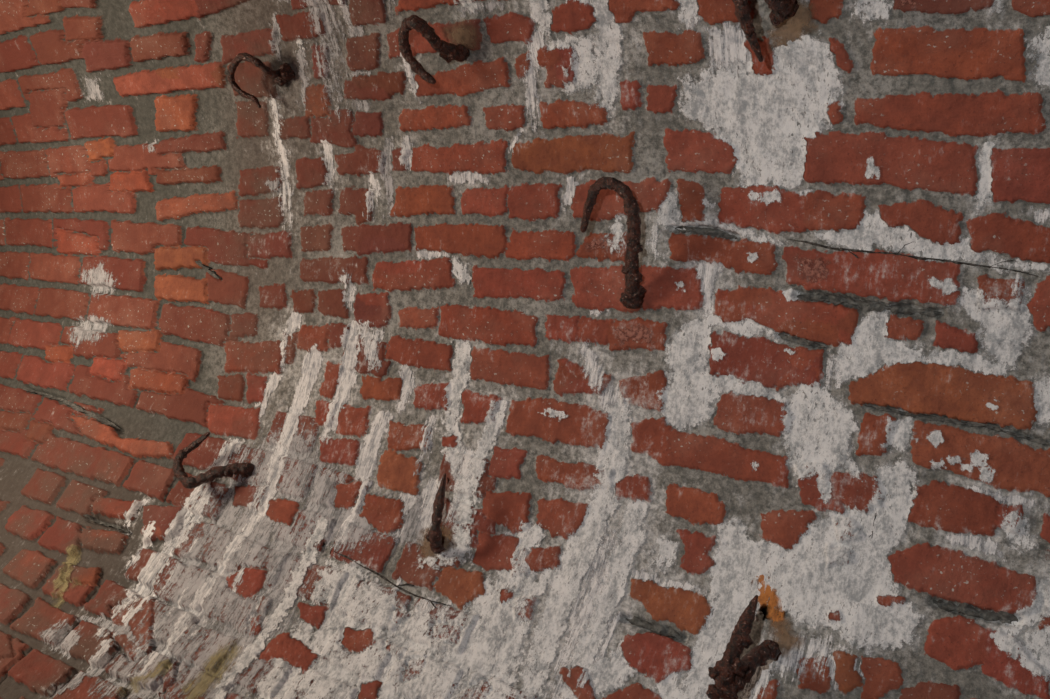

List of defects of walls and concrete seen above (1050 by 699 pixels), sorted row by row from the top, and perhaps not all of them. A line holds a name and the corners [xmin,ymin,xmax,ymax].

rust [769,0,816,48]
damp [265,0,371,234]
damp [677,0,845,206]
damp [362,135,413,222]
damp [447,170,489,185]
damp [561,176,579,212]
damp [974,141,995,215]
damp [1022,206,1050,223]
crack [789,239,1039,277]
damp [40,209,1050,699]
rust [419,526,452,558]
rust [756,575,800,654]